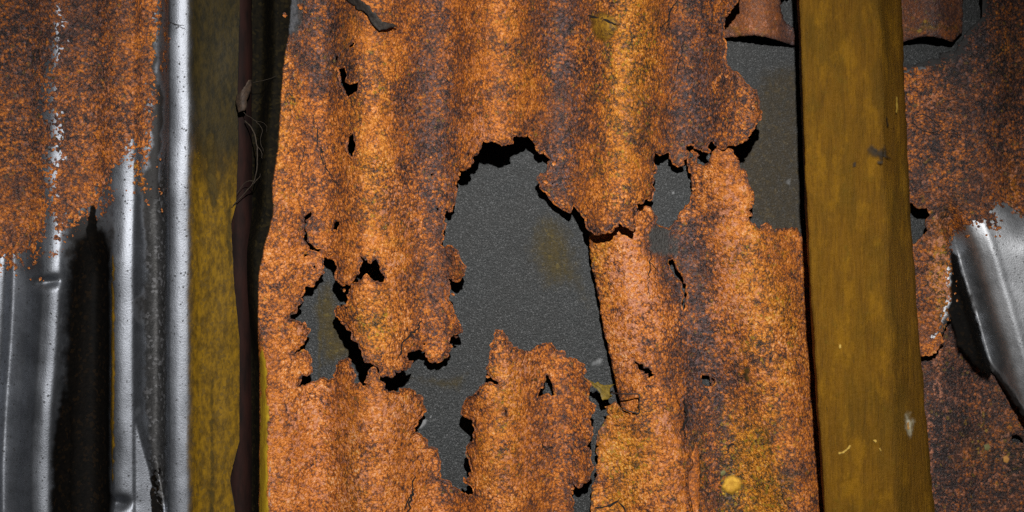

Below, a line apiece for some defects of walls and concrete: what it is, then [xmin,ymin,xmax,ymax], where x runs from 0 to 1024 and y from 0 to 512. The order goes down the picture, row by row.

corrosion [0,0,170,282]
corrosion [904,0,1024,512]